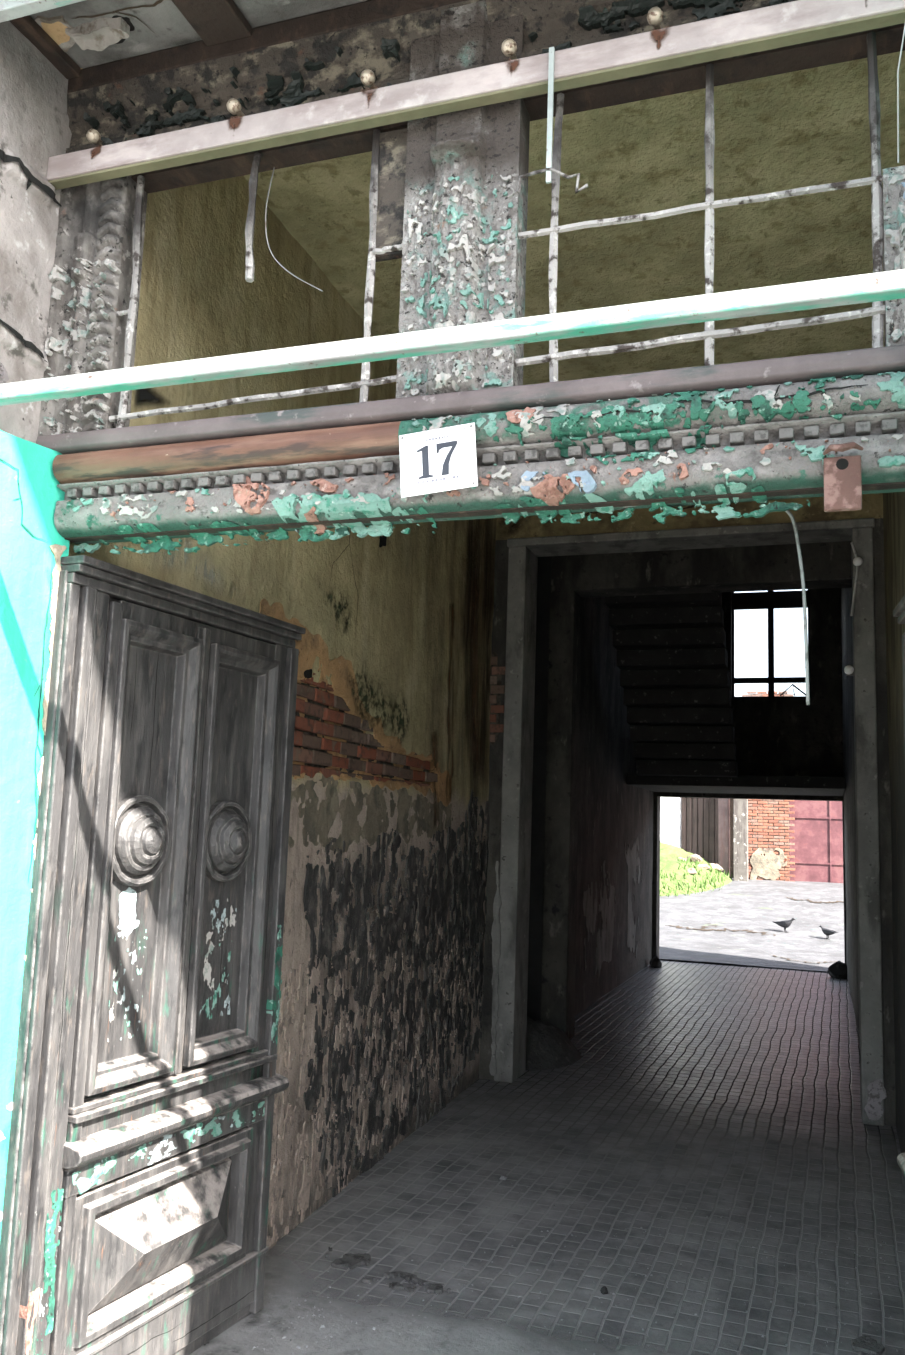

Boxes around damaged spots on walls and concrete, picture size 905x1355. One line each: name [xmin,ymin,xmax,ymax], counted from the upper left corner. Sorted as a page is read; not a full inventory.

peeling [35,15,135,52]
peeling [380,38,401,63]
peeling [83,58,392,146]
peeling [401,175,515,333]
crack [0,319,48,363]
peeling [44,258,122,377]
peeling [402,347,512,397]
crack [0,458,48,542]
peeling [40,371,905,745]
crack [28,575,52,883]
peeling [19,599,502,1355]